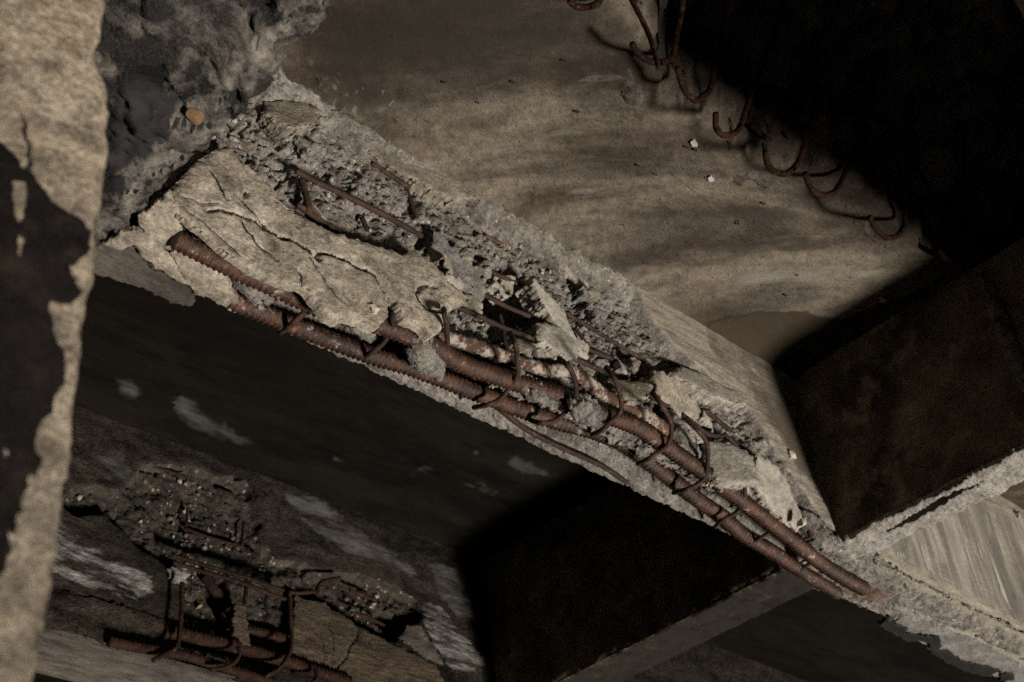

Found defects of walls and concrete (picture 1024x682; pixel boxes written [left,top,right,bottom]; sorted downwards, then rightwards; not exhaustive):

spalling [732,29,882,198]
crack [183,170,379,305]
spalling [92,68,1024,600]
spalling [45,463,444,682]
spalling [819,553,1024,682]